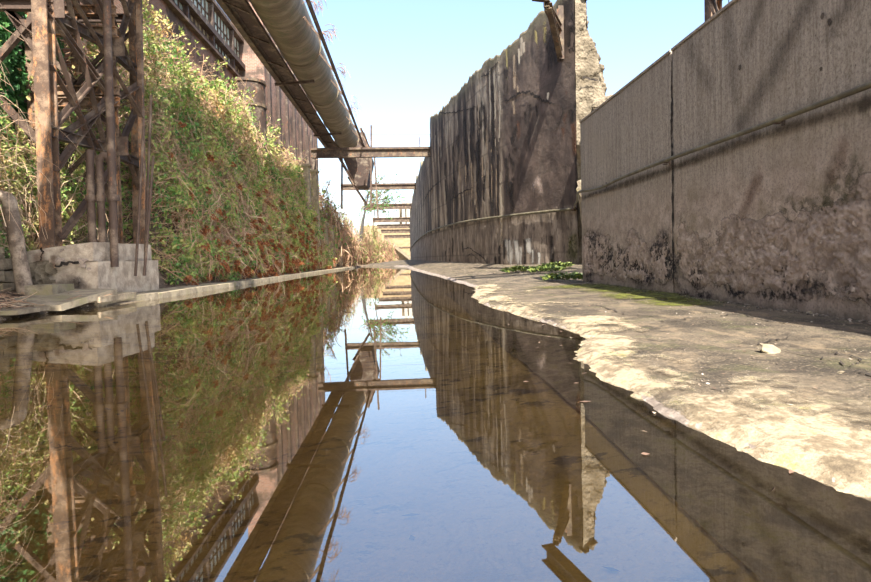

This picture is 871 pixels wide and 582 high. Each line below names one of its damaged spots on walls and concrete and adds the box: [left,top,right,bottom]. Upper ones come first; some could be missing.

damp [562,0,575,53]
damp [432,27,557,264]
damp [586,232,745,299]
damp [758,266,861,301]
crack [572,290,871,375]
damp [472,284,871,582]